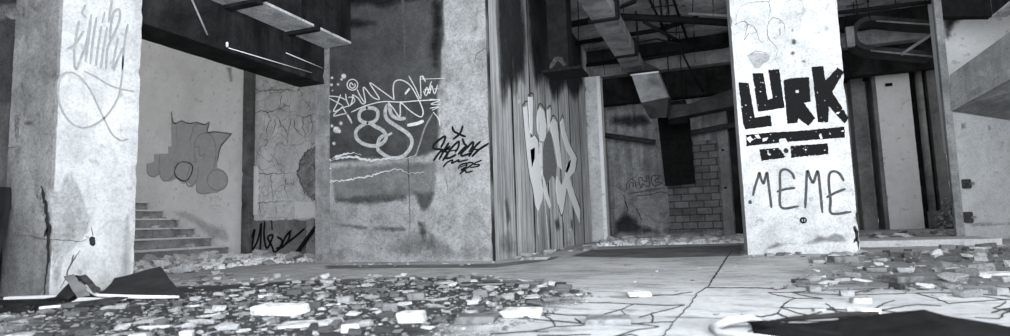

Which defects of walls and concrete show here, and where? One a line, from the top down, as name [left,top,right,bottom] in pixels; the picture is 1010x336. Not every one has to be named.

crack [735,0,804,64]
crack [255,87,315,216]
spalling [296,146,315,201]
peeling [329,152,424,183]
crack [16,186,93,294]
crack [489,251,1010,336]